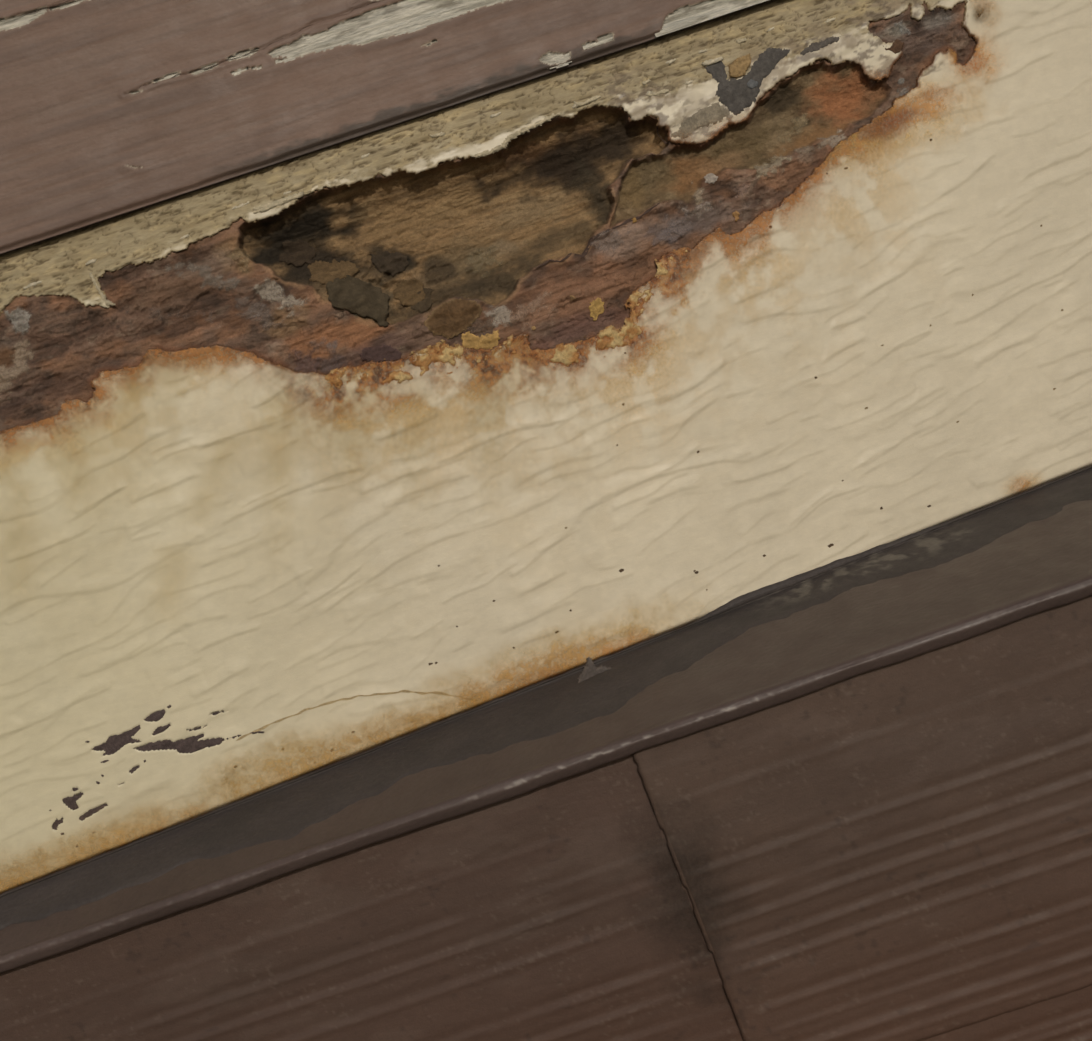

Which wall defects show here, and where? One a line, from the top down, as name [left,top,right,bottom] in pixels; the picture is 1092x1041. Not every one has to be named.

peeling [0,0,83,31]
peeling [655,0,768,37]
peeling [154,0,505,83]
peeling [582,33,613,50]
peeling [539,52,572,69]
peeling [698,36,839,116]
damp [671,102,730,139]
peeling [359,344,403,363]
peeling [461,329,500,349]
damp [236,690,479,741]
spalling [85,705,264,785]
spalling [49,787,108,835]